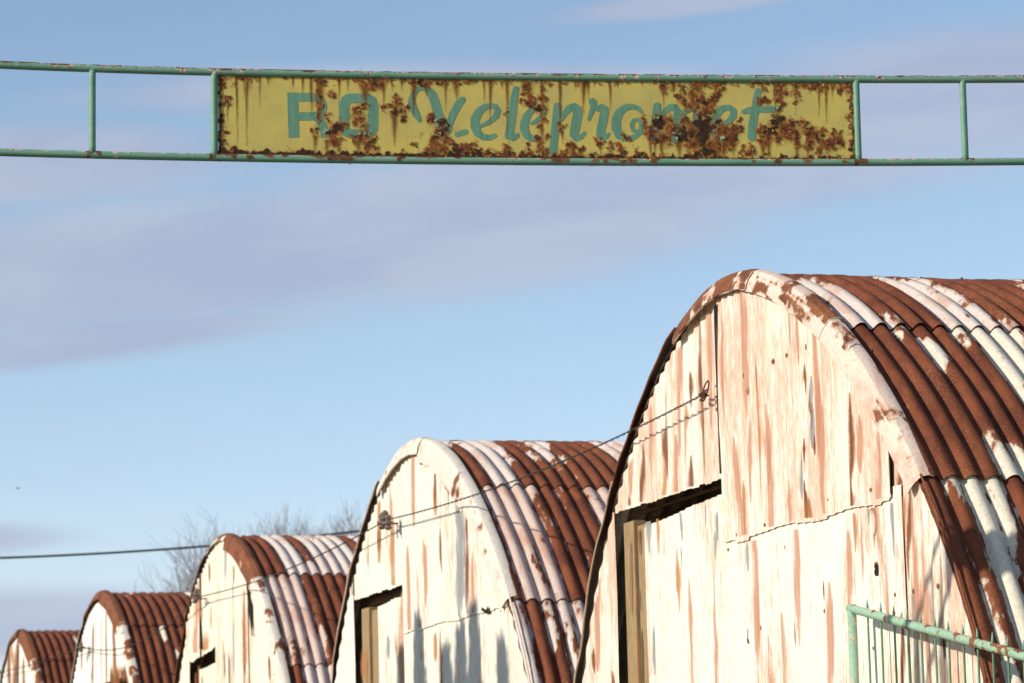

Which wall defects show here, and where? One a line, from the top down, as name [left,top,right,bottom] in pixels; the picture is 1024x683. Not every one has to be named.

peeling [706,310,726,428]
peeling [788,313,799,363]
rust [425,379,659,683]
rust [672,269,1024,683]
rust [7,592,212,683]
rust [208,533,347,683]